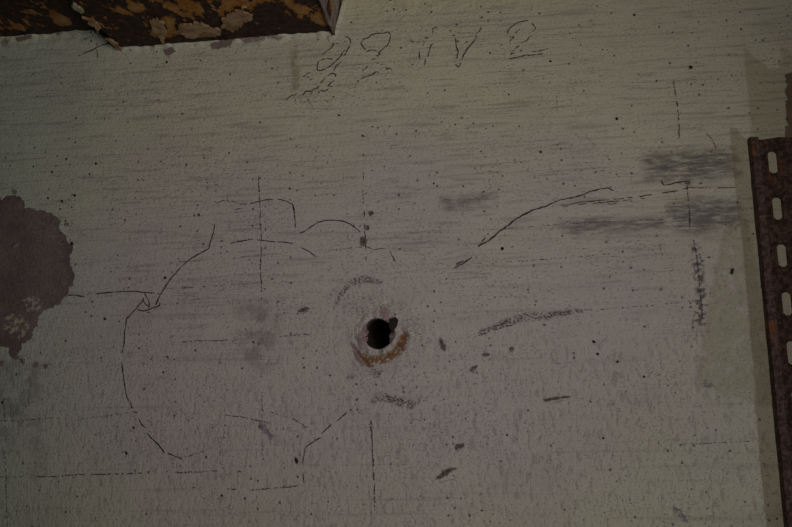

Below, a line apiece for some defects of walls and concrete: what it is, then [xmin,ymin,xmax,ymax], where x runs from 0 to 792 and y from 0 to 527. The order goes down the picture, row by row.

corrosion [353,331,410,368]